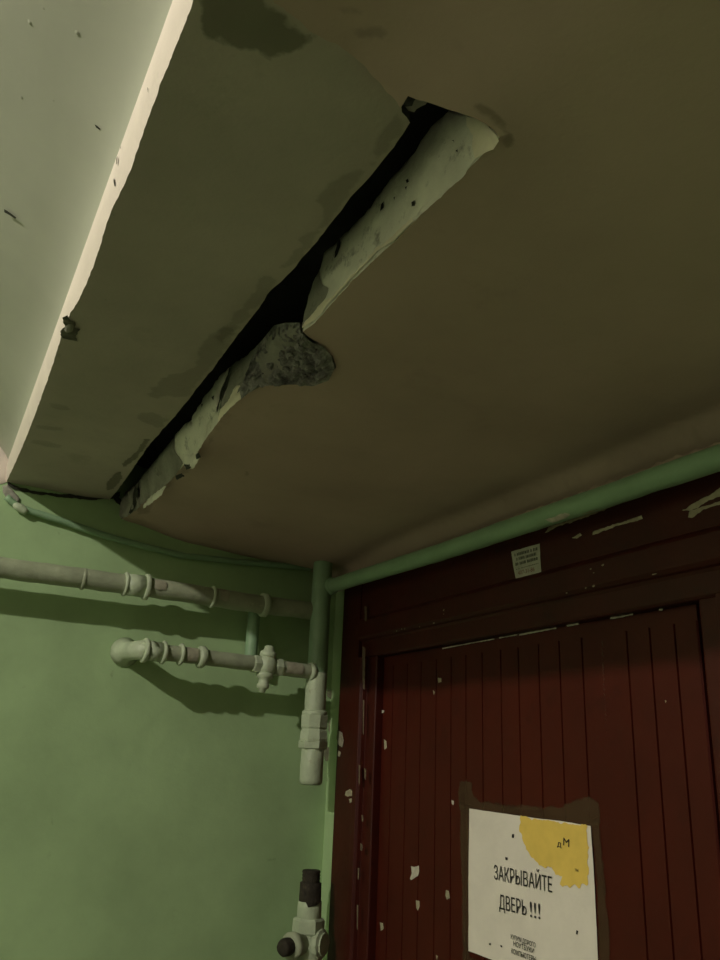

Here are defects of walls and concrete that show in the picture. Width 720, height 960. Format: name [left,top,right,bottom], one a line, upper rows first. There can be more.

crack [136,96,451,469]
peeling [119,113,499,518]